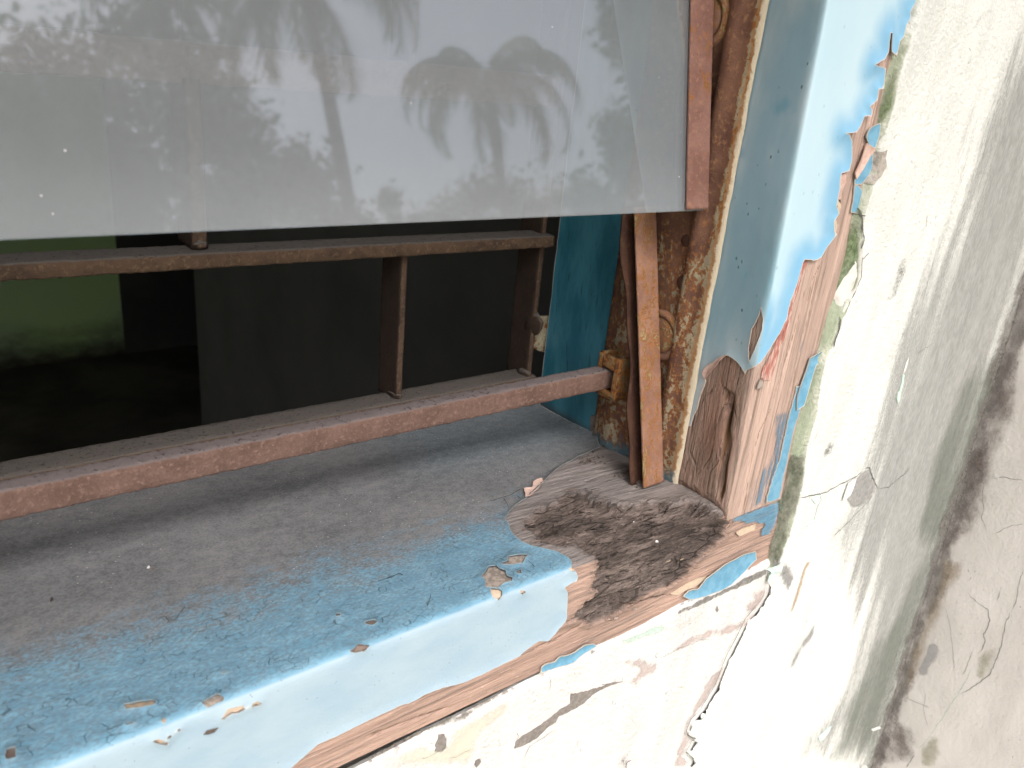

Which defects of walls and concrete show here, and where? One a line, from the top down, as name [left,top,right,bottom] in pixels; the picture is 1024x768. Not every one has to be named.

flaking render [834,123,887,232]
peeling [756,260,807,389]
peeling [734,351,823,536]
leakage [818,65,1024,768]
peeling [524,478,544,497]
crack [800,467,908,535]
flaking render [847,471,875,506]
peeling [482,556,526,599]
peeling [670,551,757,600]
peeling [539,643,597,674]
crack [907,573,1023,766]
flaking render [514,681,620,749]